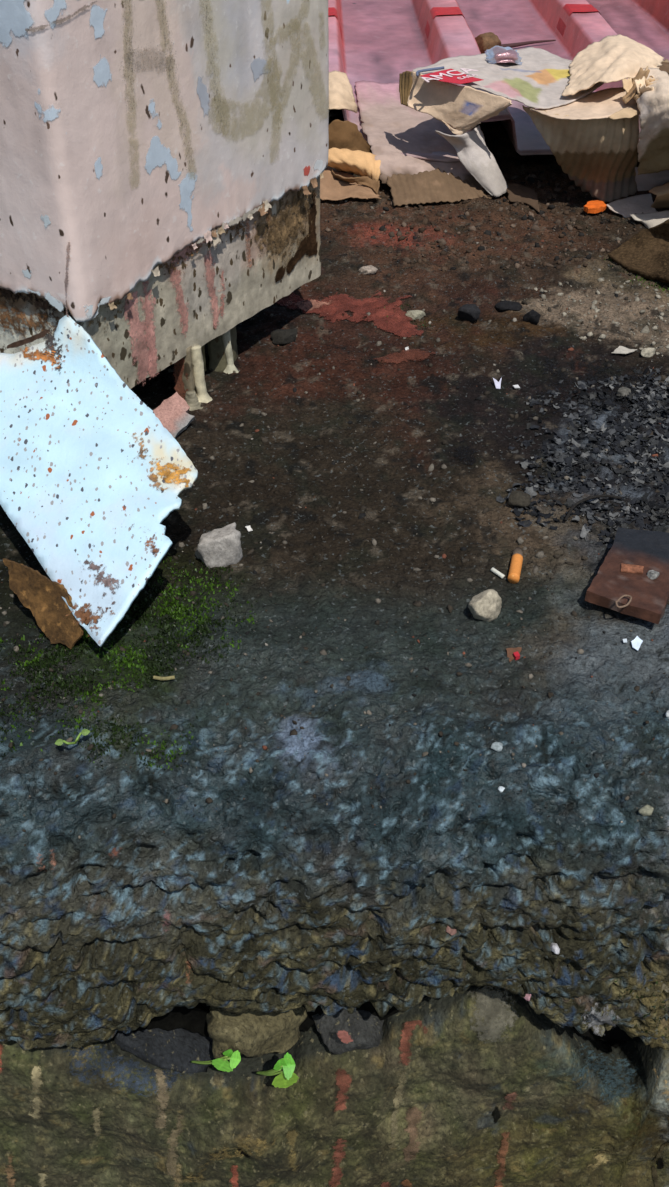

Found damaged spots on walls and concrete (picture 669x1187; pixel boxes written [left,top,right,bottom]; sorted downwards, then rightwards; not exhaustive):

peeling [0,0,67,47]
peeling [89,5,107,38]
peeling [93,57,112,87]
corrosion [132,432,191,490]
corrosion [66,559,119,636]
spalling [467,986,517,1043]
spalling [583,1003,619,1036]
spalling [567,1044,641,1104]